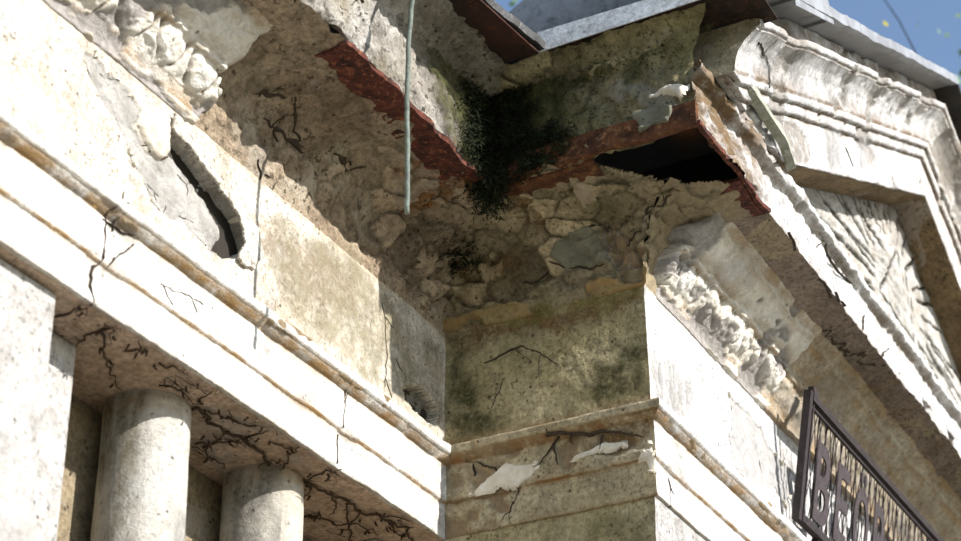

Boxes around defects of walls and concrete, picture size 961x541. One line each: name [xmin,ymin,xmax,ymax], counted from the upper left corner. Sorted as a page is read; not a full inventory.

crack [254,85,304,153]
crack [142,145,192,222]
peeling [84,50,264,270]
crack [257,159,271,180]
peeling [573,180,597,208]
crack [88,191,135,307]
spalling [604,231,650,278]
crack [381,302,407,398]
crack [336,388,355,464]
spalling [406,389,433,423]
peeling [467,461,540,497]
peeling [571,440,658,474]